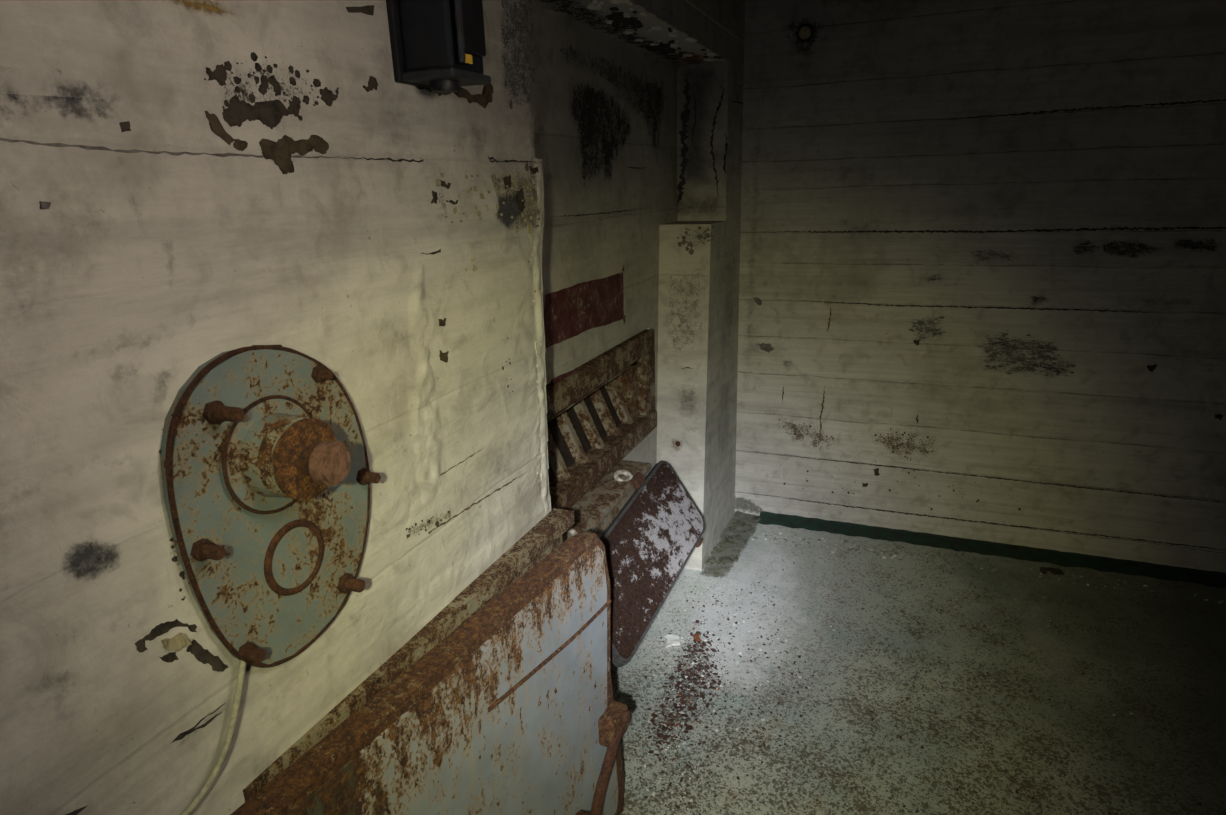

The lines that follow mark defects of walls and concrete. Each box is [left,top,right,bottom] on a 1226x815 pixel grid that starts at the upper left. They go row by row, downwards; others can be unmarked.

peeling [204,50,339,174]
peeling [362,76,378,92]
damp [556,41,664,181]
crack [677,73,744,213]
spalling [431,159,551,514]
damp [68,542,118,578]
rust [165,345,370,668]
spalling [134,619,228,672]